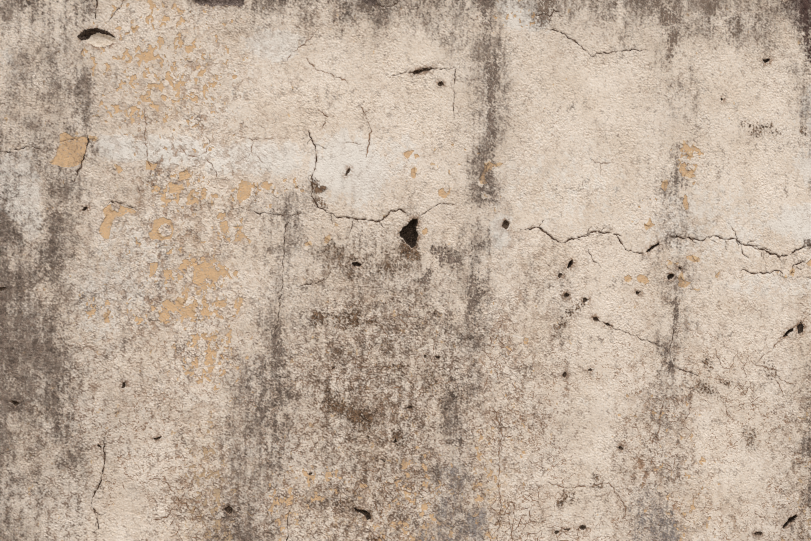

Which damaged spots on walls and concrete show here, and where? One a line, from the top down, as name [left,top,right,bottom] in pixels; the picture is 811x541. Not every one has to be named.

peeling [82,0,218,128]
flaking render [195,0,244,13]
leakage [472,0,508,207]
leakage [609,0,727,63]
leakage [760,0,811,63]
leakage [0,199,79,437]
peeling [123,161,253,390]
crack [246,110,454,330]
spalling [399,219,427,248]
crack [525,220,642,264]
crack [671,223,811,278]
crack [595,302,810,481]